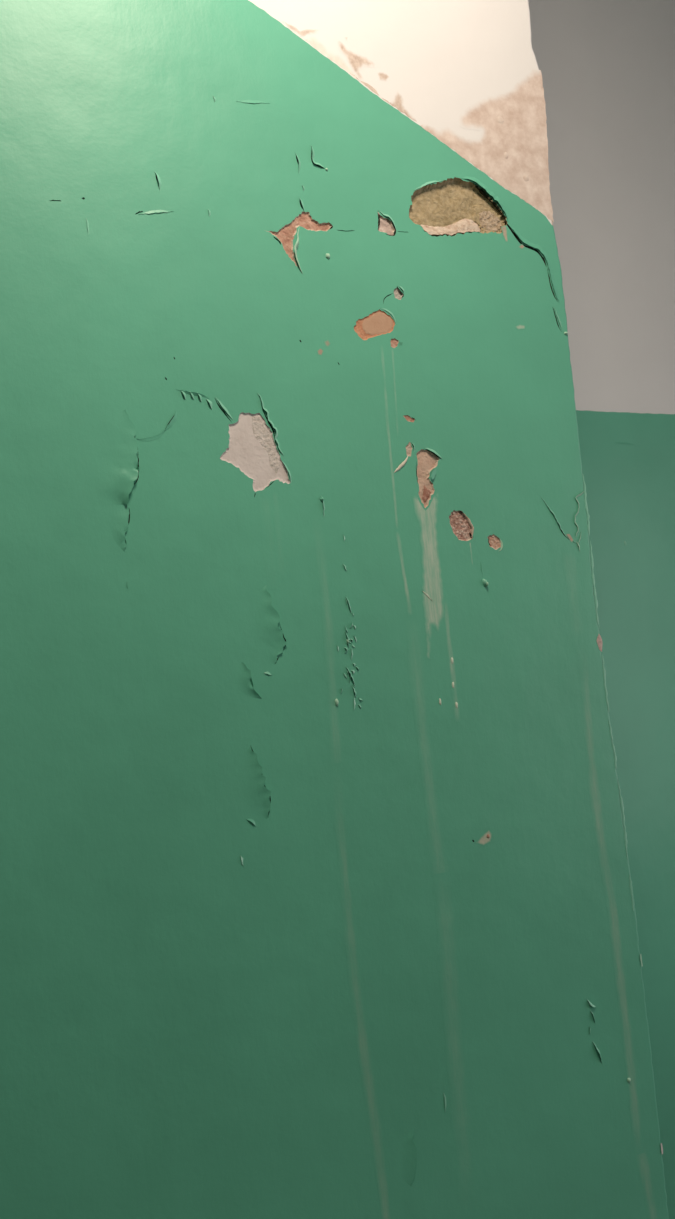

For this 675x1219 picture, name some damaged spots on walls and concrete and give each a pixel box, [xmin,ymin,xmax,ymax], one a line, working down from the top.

peeling [279,19,554,242]
peeling [267,145,333,274]
peeling [354,286,404,348]
crack [504,221,568,335]
peeling [215,395,291,497]
peeling [406,442,441,508]
peeling [449,510,503,565]
leakage [380,345,478,1215]